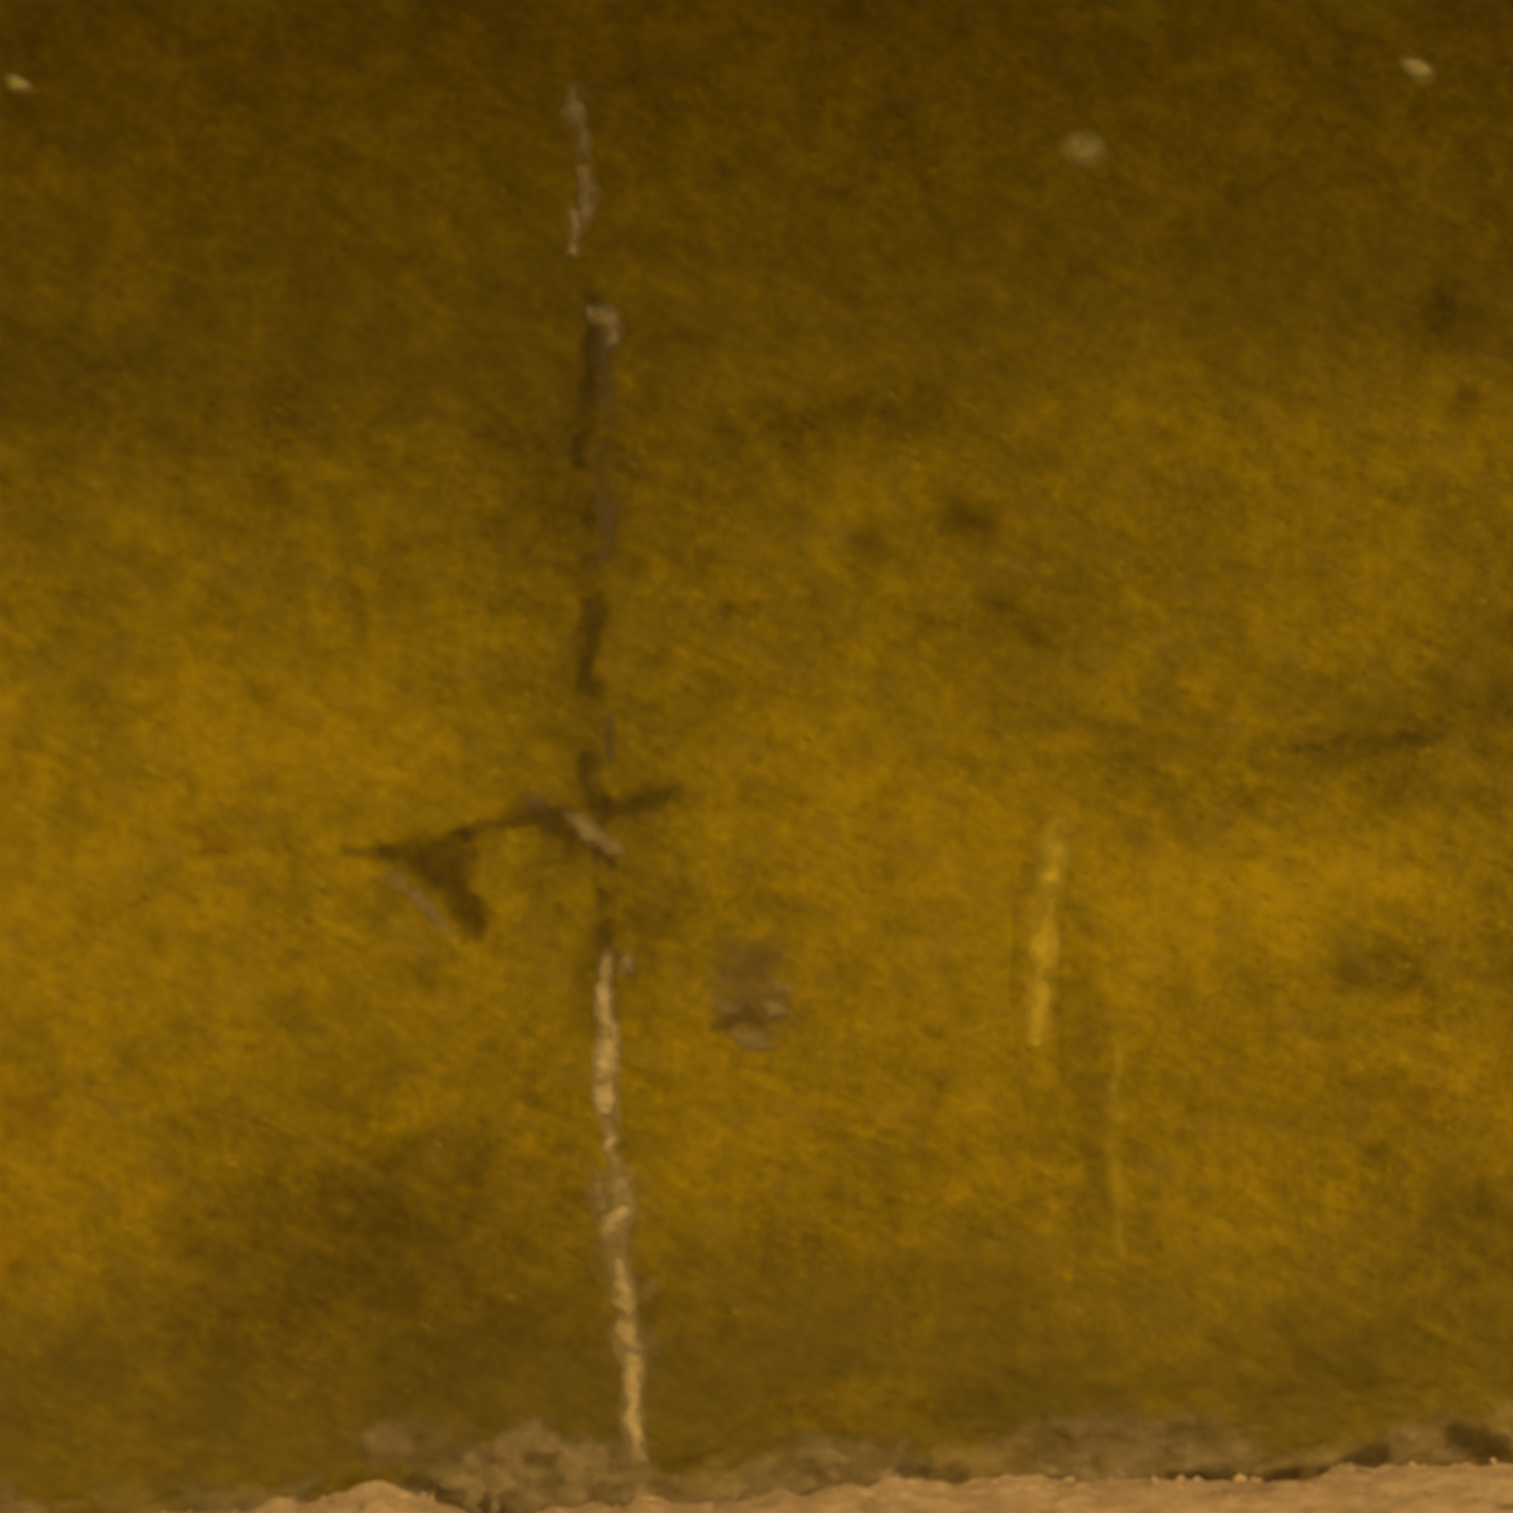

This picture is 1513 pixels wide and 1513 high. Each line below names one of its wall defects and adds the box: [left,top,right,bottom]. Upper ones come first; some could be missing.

leakage [592,955,654,1496]